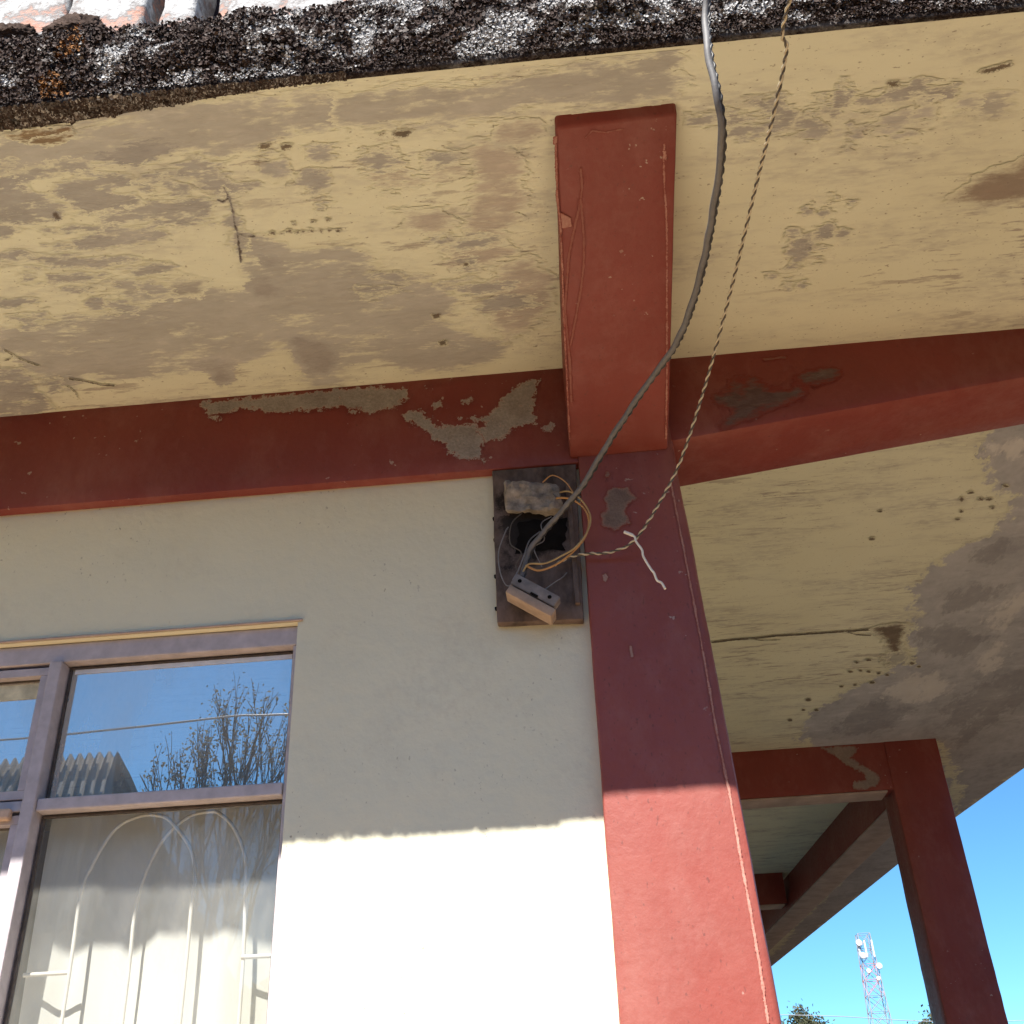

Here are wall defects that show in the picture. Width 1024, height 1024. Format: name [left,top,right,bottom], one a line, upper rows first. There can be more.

crack [217,187,256,263]
peeling [0,49,697,464]
peeling [599,470,638,532]
crack [711,629,872,643]
water stain [791,424,1024,817]
peeling [820,745,882,792]
water stain [769,836,898,966]